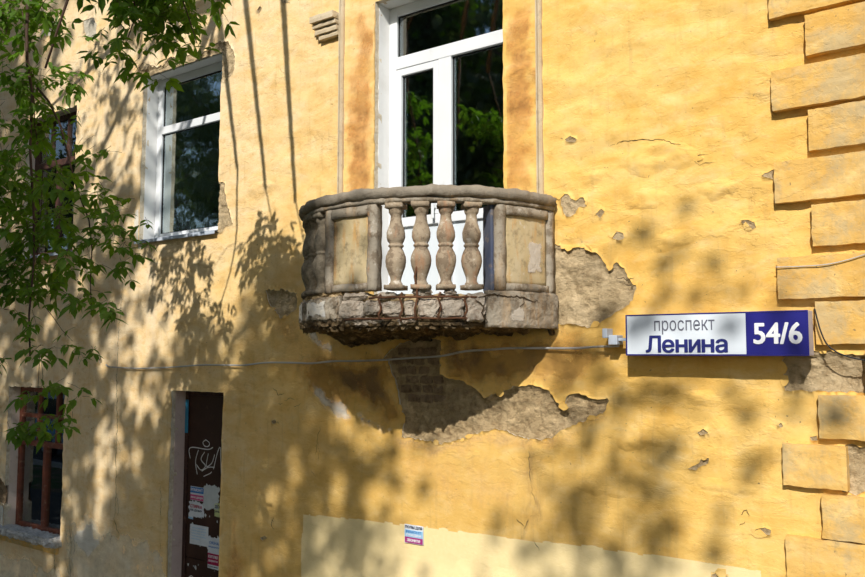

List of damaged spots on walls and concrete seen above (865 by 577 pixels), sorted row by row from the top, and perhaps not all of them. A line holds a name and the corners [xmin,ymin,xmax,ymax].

spalling [139,41,235,89]
spalling [216,182,232,233]
peeling [528,242,541,272]
spalling [262,284,297,319]
spalling [553,244,636,328]
leakage [307,333,397,419]
spalling [384,339,609,446]
spalling [777,350,865,393]
spalling [0,478,8,505]
spalling [843,444,865,495]